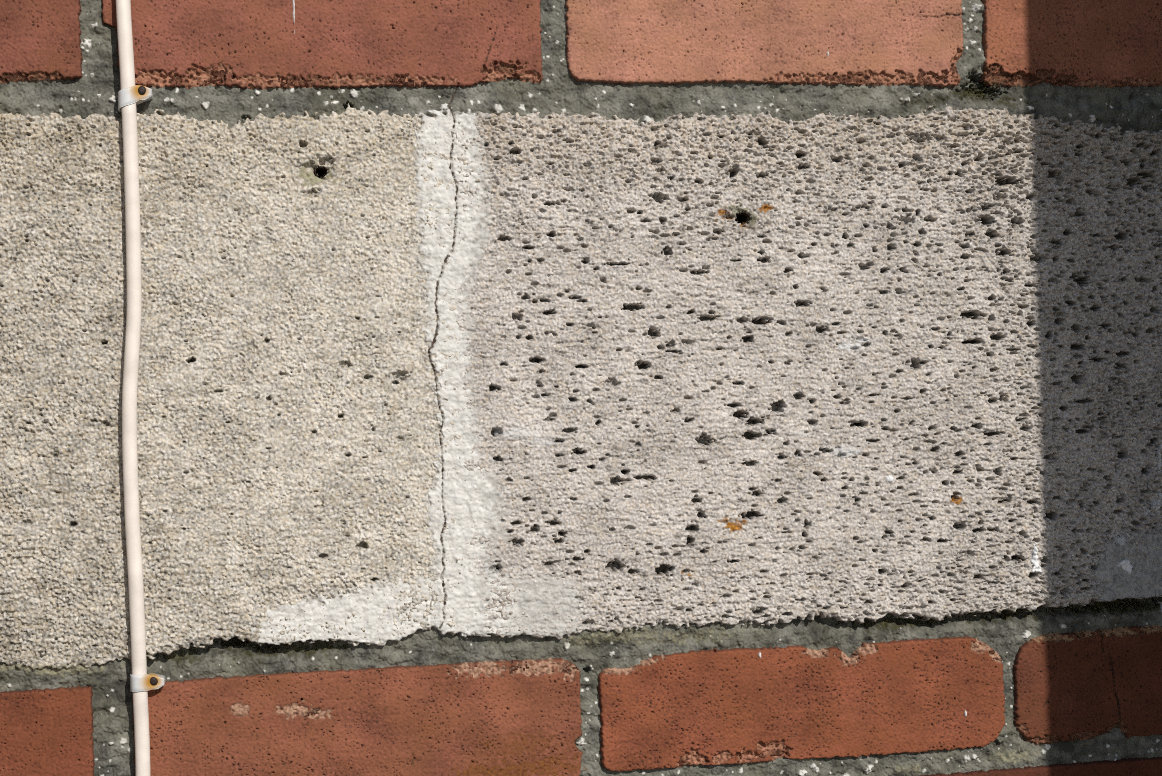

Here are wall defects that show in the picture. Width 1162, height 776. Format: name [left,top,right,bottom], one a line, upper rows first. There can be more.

crack [428,32,496,629]